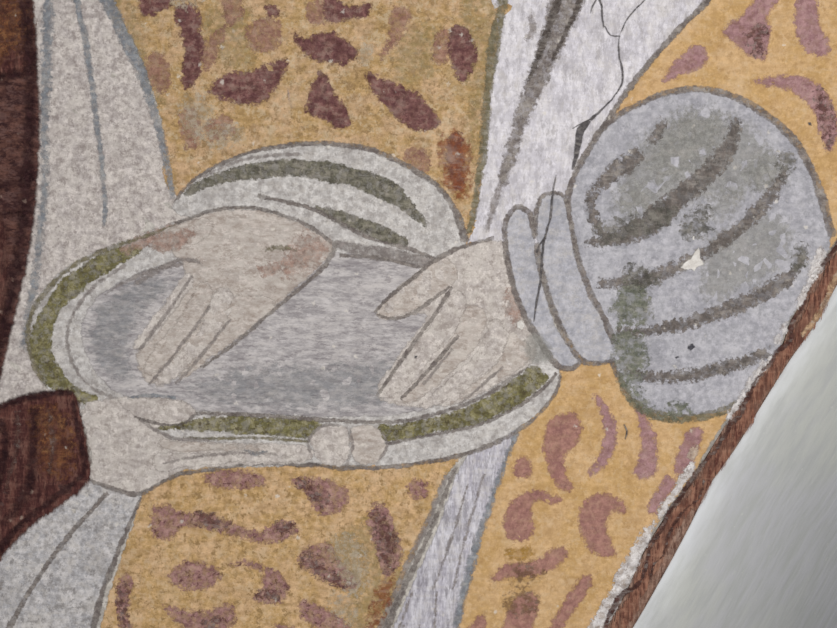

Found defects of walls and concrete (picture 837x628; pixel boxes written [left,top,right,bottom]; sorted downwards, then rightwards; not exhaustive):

crack [534,0,645,320]
spalling [681,236,704,271]
spalling [587,242,837,628]